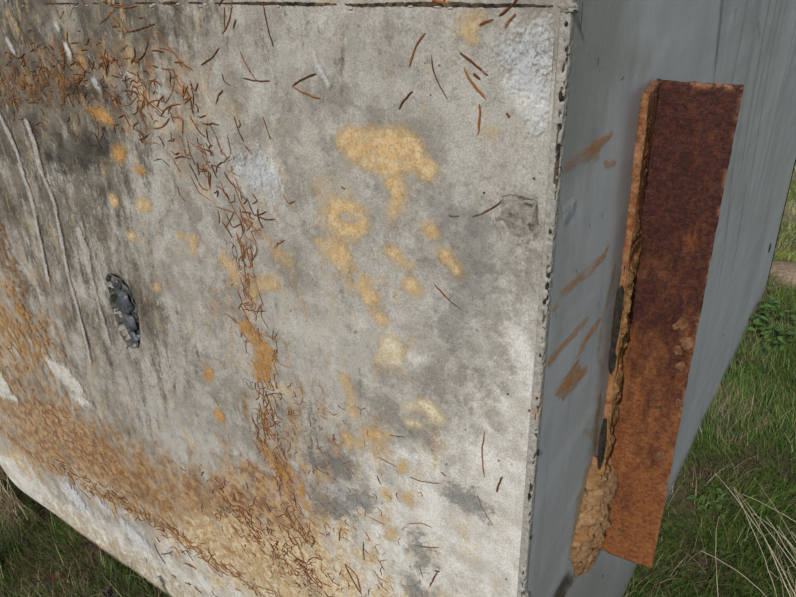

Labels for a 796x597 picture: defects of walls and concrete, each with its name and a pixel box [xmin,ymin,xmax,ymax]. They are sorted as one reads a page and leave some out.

crack [46,1,553,10]
rust [455,0,517,43]
rust [459,51,489,134]
rust [565,132,616,170]
spalling [105,274,140,349]
rust [0,0,446,597]
rust [603,87,659,464]
rust [547,317,601,400]
damp [555,574,572,597]